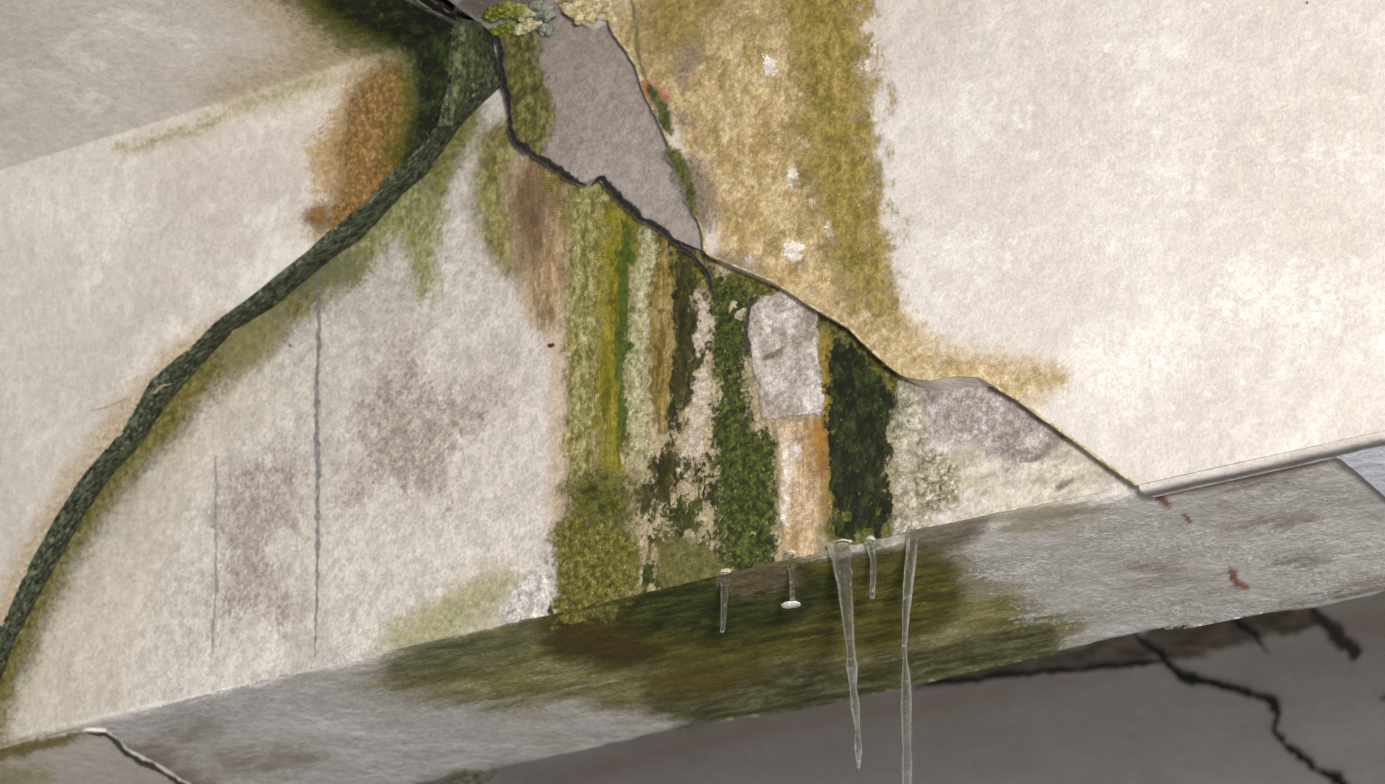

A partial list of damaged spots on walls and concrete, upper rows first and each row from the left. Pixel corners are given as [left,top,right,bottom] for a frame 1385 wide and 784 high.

peeling [762,53,779,78]
peeling [783,237,806,262]
crack [0,0,715,680]
water stain [219,105,1115,630]
spalling [676,289,825,479]
water stain [0,317,220,626]
water stain [198,431,315,659]
spalling [502,565,554,624]
crack [913,633,1348,784]
corrosion [1154,495,1192,523]
corrosion [1227,566,1250,589]
crack [1233,619,1271,655]